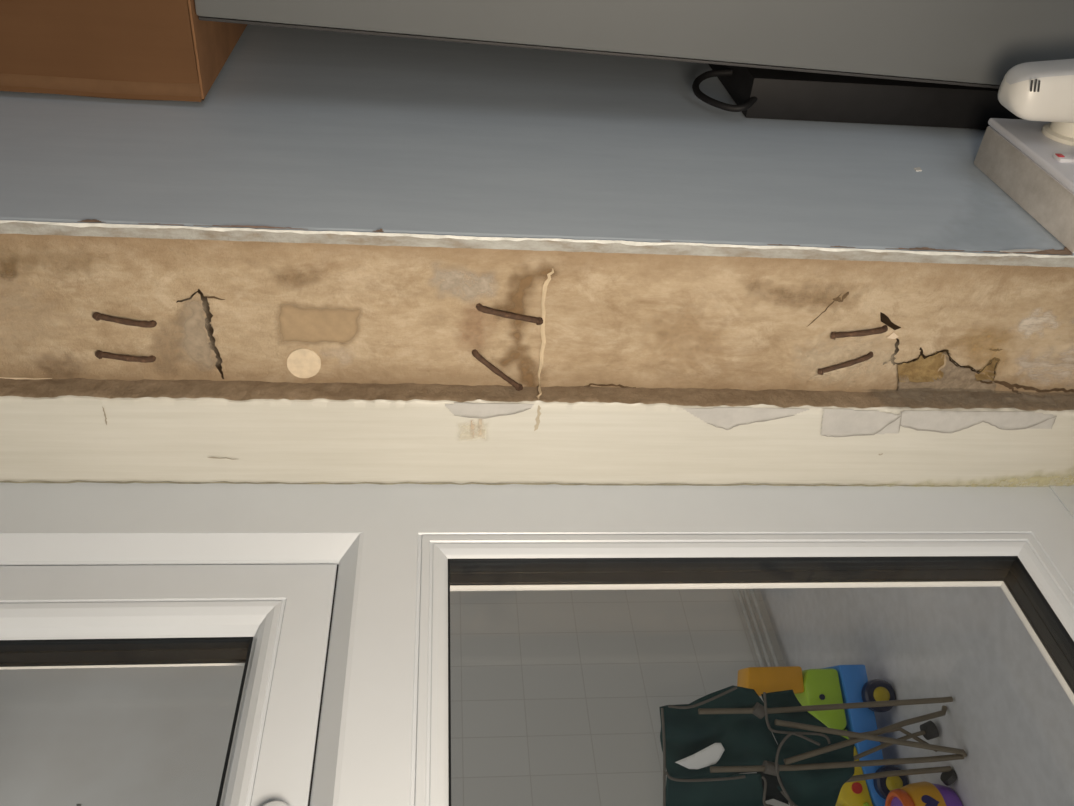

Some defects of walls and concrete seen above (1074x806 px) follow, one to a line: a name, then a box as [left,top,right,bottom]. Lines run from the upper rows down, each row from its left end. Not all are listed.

peeling [0,219,1074,258]
crack [176,289,225,379]
corrosion [497,268,555,387]
spalling [803,312,1074,437]
crack [979,380,1074,394]
peeling [445,403,534,419]
peeling [683,407,809,430]